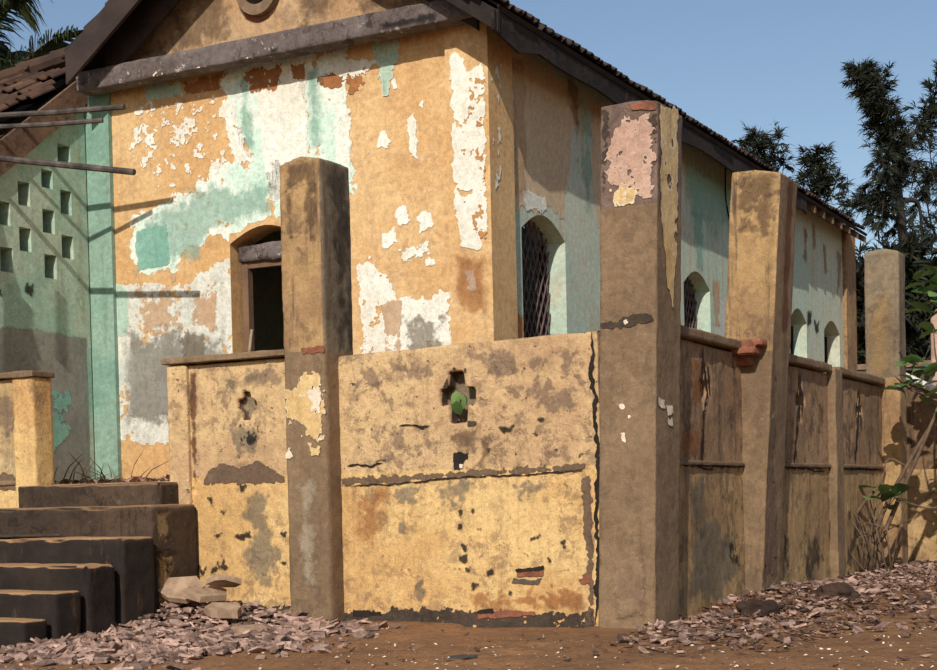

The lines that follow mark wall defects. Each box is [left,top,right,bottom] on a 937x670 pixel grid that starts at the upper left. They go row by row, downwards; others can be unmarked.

peeling [116,47,376,456]
peeling [356,256,451,354]
peeling [381,205,435,266]
peeling [464,269,477,292]
peeling [449,49,575,250]
peeling [589,92,679,308]
spalling [204,461,285,485]
crack [588,313,654,623]
crack [683,350,744,471]
crack [785,374,882,472]